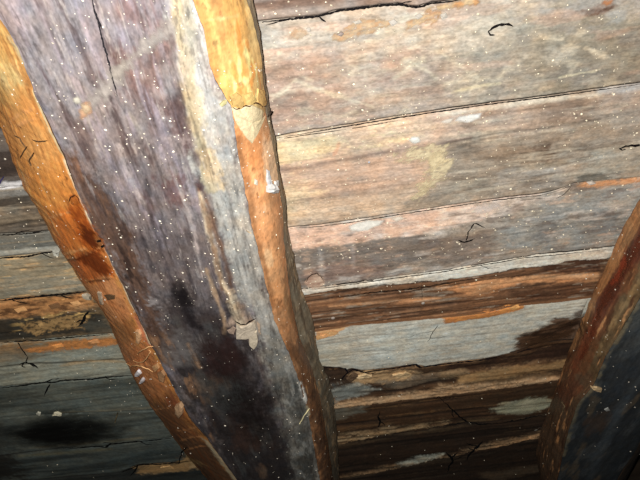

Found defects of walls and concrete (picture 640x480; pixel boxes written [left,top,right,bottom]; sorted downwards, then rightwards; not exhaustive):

crack [262,0,458,25]
crack [92,0,118,96]
leakage [174,282,201,329]
leakage [519,310,587,351]